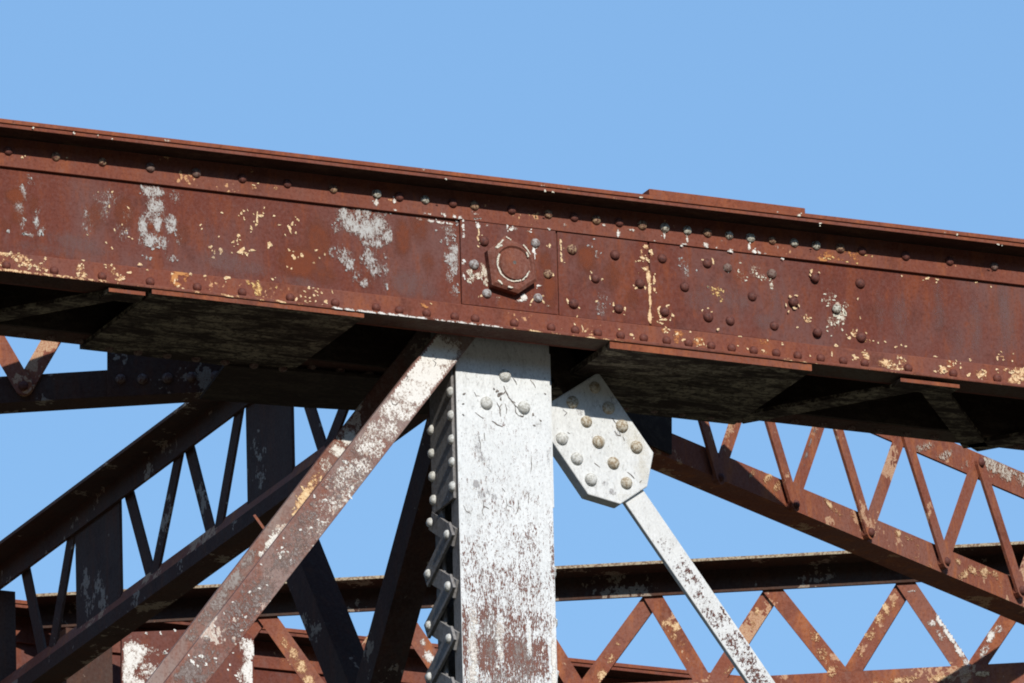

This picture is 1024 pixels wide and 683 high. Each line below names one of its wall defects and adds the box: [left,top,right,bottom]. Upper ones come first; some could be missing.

peeling [6,174,45,238]
peeling [0,185,182,284]
corrosion [170,271,192,289]
corrosion [284,226,334,278]
peeling [286,197,396,290]
peeling [633,233,675,324]
corrosion [817,250,873,264]
corrosion [662,326,707,347]
peeling [821,292,915,375]
peeling [122,276,557,683]
corrosion [459,411,556,683]
corrosion [657,535,769,683]